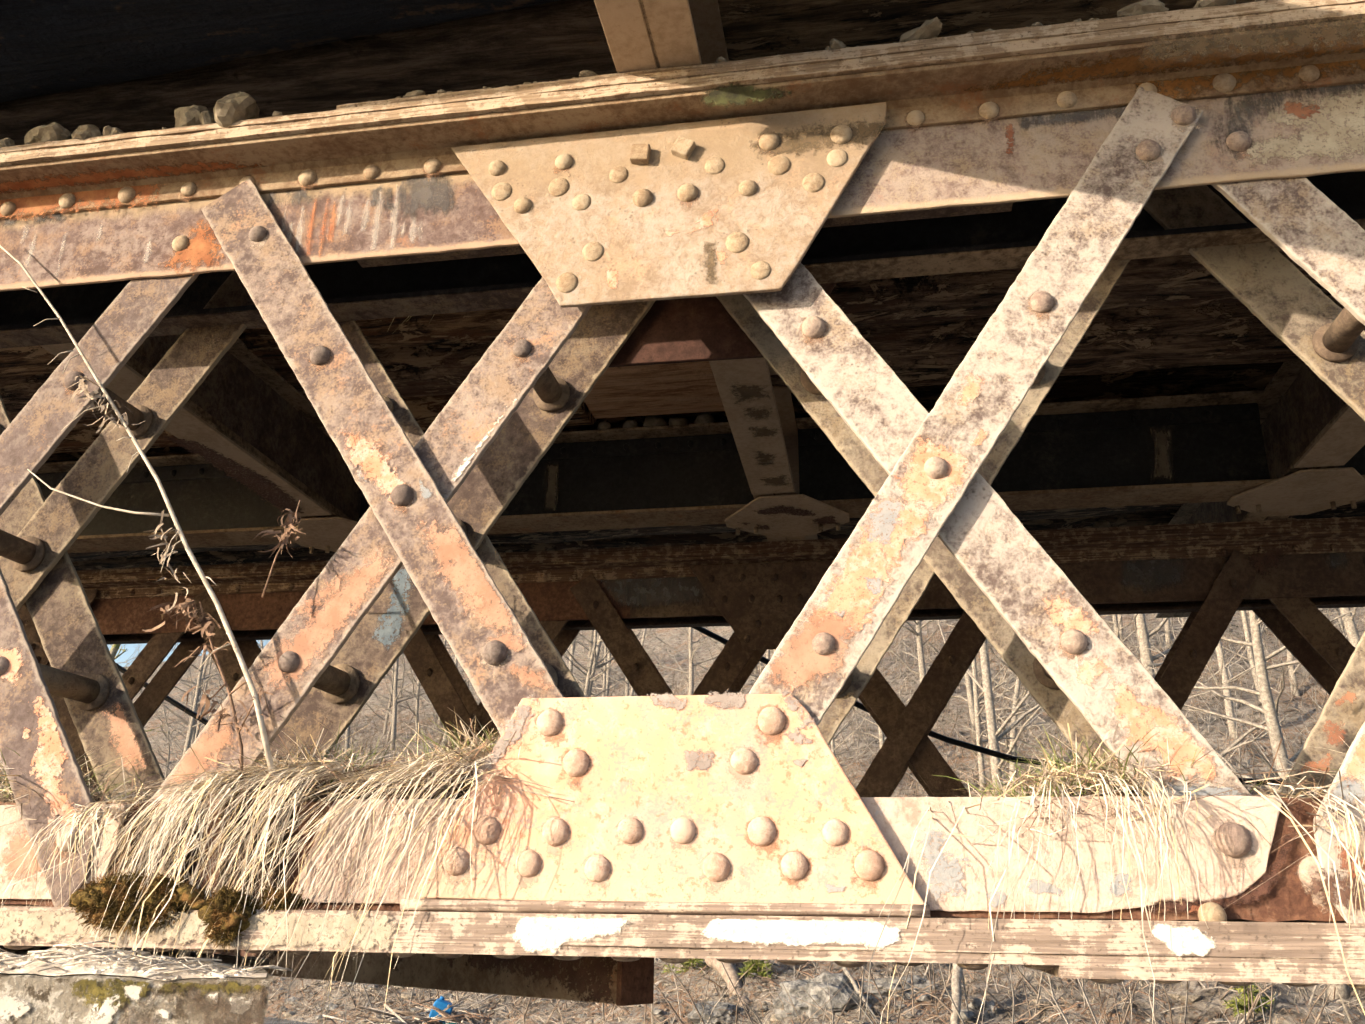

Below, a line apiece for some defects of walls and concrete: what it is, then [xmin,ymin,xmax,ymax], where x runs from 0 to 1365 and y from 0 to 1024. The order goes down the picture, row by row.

rust [965,29,1365,119]
rust [1005,124,1015,154]
rust [0,160,266,221]
rust [158,220,224,271]
peeling [921,828,969,901]